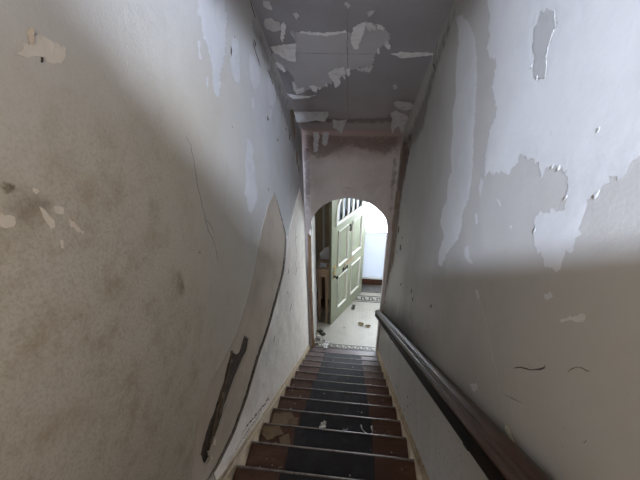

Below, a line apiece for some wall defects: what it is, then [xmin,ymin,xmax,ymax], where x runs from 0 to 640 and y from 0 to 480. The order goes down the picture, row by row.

peeling [16,27,66,64]
peeling [197,0,240,97]
peeling [264,10,390,99]
peeling [267,77,276,122]
peeling [438,14,477,268]
peeling [479,0,640,272]
peeling [0,213,16,228]
peeling [40,206,64,229]
flaking render [192,188,286,480]